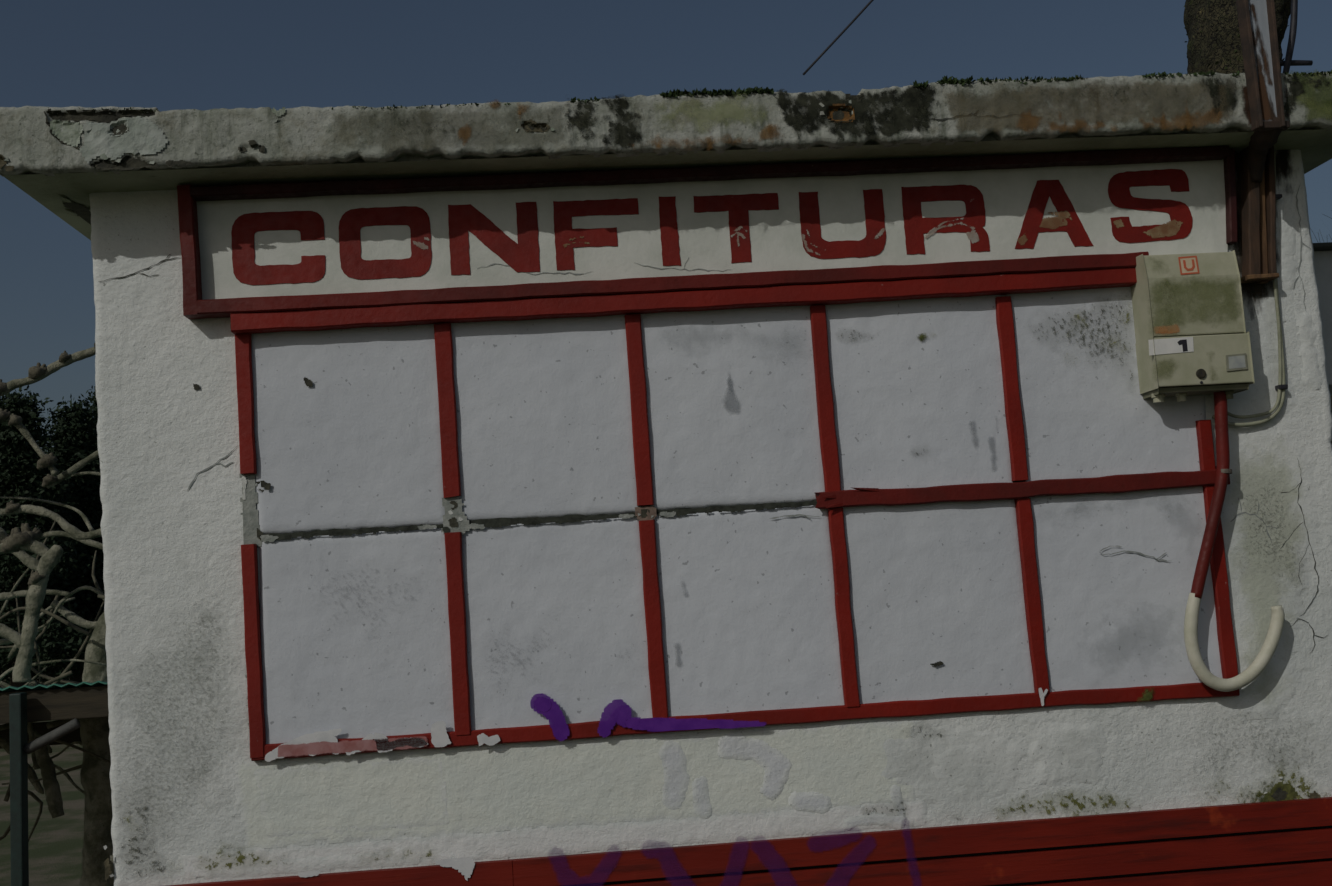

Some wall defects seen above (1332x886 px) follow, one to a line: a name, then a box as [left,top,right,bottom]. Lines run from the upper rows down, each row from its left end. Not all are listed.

peeling [46,108,193,170]
mould [565,95,641,148]
mould [777,85,939,141]
mould [1284,74,1330,116]
crack [98,254,182,282]
mould [1035,296,1133,380]
crack [187,447,236,491]
crack [1230,458,1329,653]